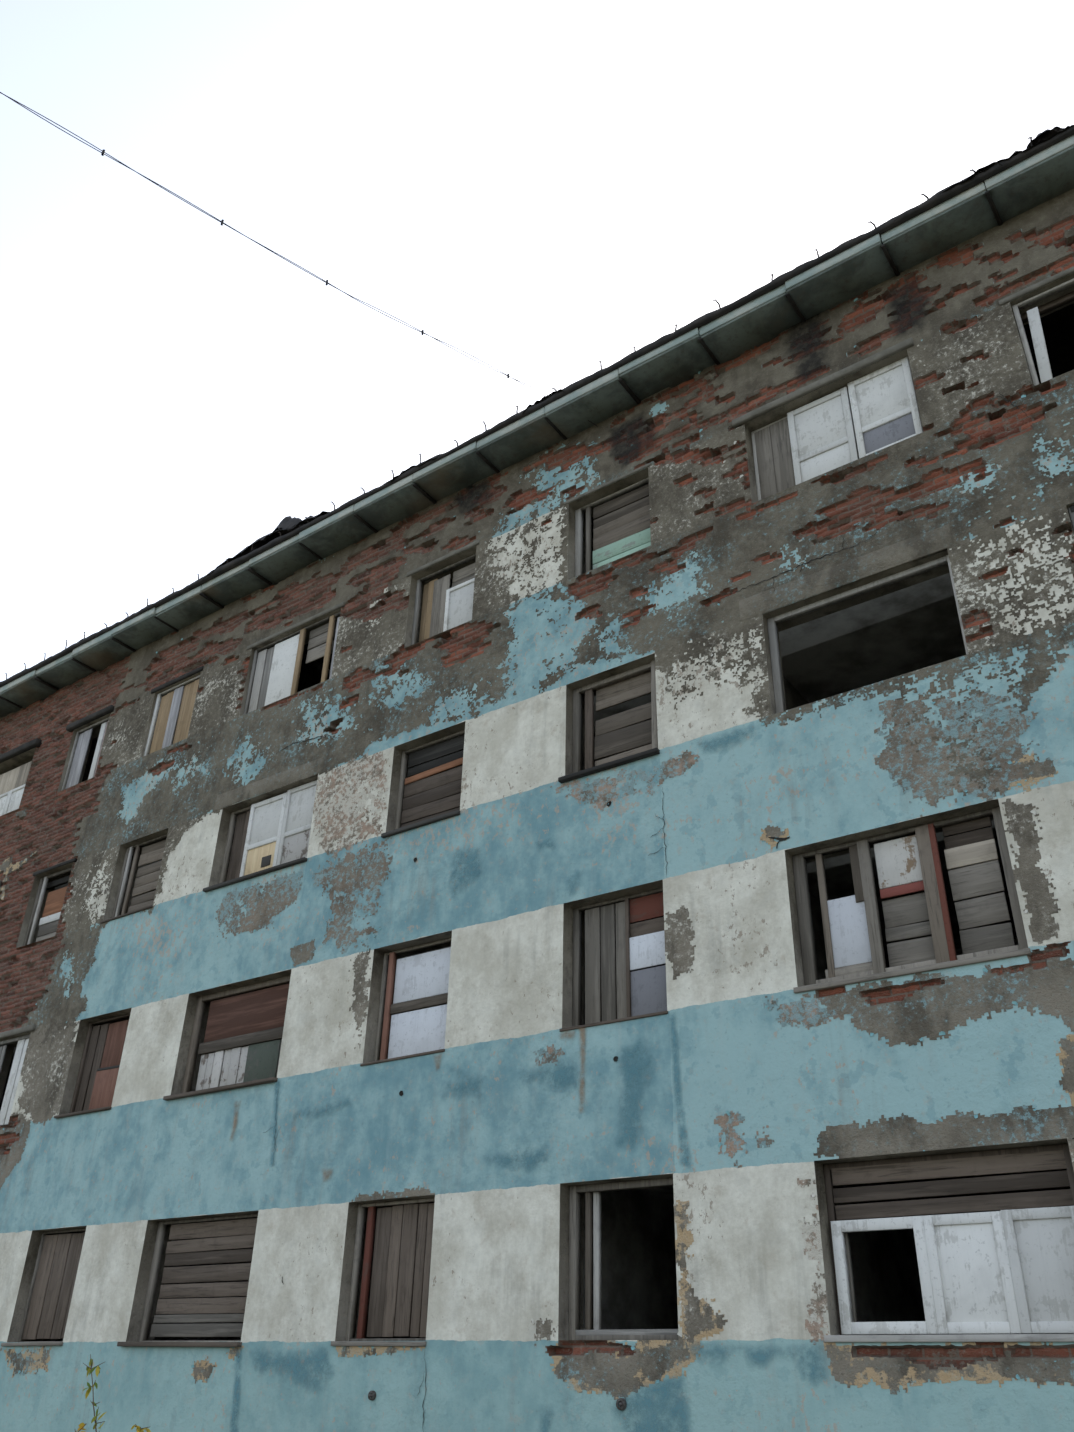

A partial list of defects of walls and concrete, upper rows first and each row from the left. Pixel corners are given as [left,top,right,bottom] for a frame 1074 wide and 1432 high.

peeling [0,188,1074,1189]
peeling [351,1186,435,1202]
peeling [531,1200,728,1400]
peeling [797,1178,1074,1395]